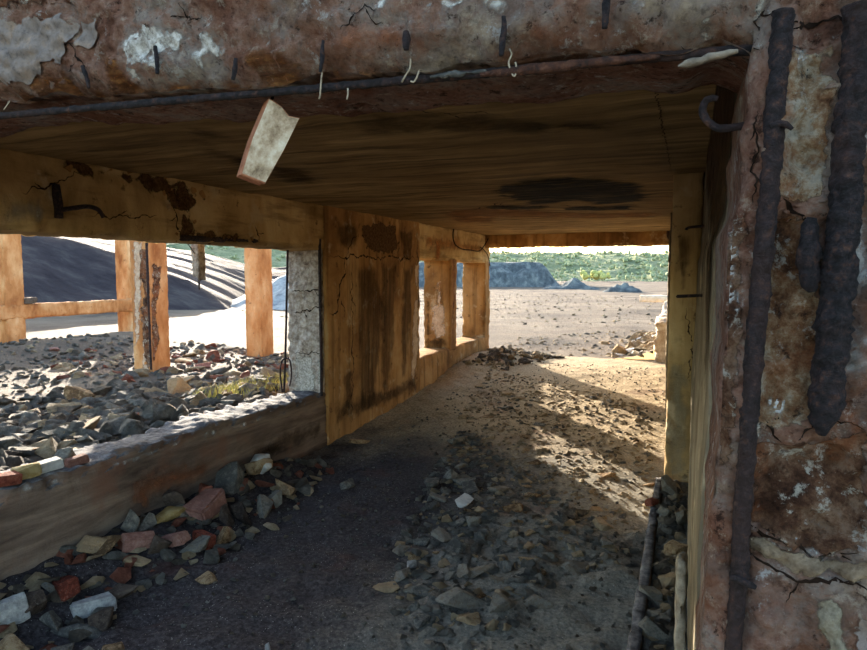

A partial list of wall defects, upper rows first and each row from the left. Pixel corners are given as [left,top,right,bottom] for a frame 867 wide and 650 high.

peeling [0,0,97,86]
corrosion [10,56,198,103]
corrosion [245,51,309,87]
crack [340,3,383,29]
spalling [0,15,753,120]
water stain [485,177,659,211]
crack [750,111,760,203]
crack [291,230,419,420]
spalling [717,0,867,650]
crack [750,525,867,602]